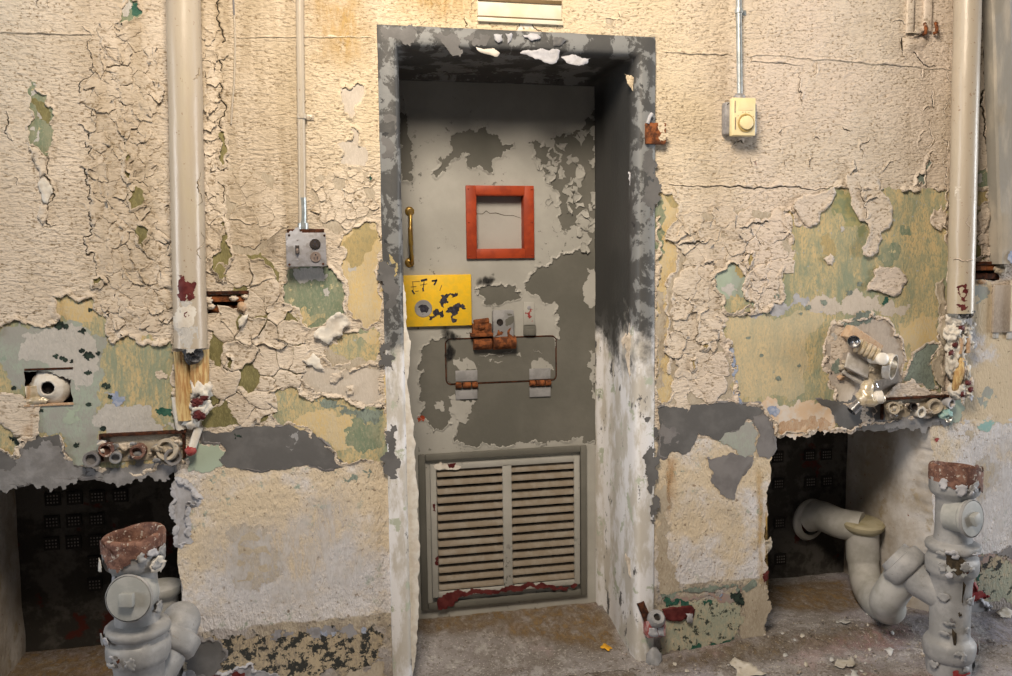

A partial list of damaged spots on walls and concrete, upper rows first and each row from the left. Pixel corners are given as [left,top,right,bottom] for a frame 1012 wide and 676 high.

peeling [380,24,417,46]
peeling [434,24,590,66]
crack [193,0,374,258]
peeling [381,90,417,186]
peeling [0,0,401,573]
peeling [415,108,596,450]
crack [209,371,248,411]
peeling [621,323,632,378]
peeling [641,148,1012,673]
peeling [182,623,387,676]